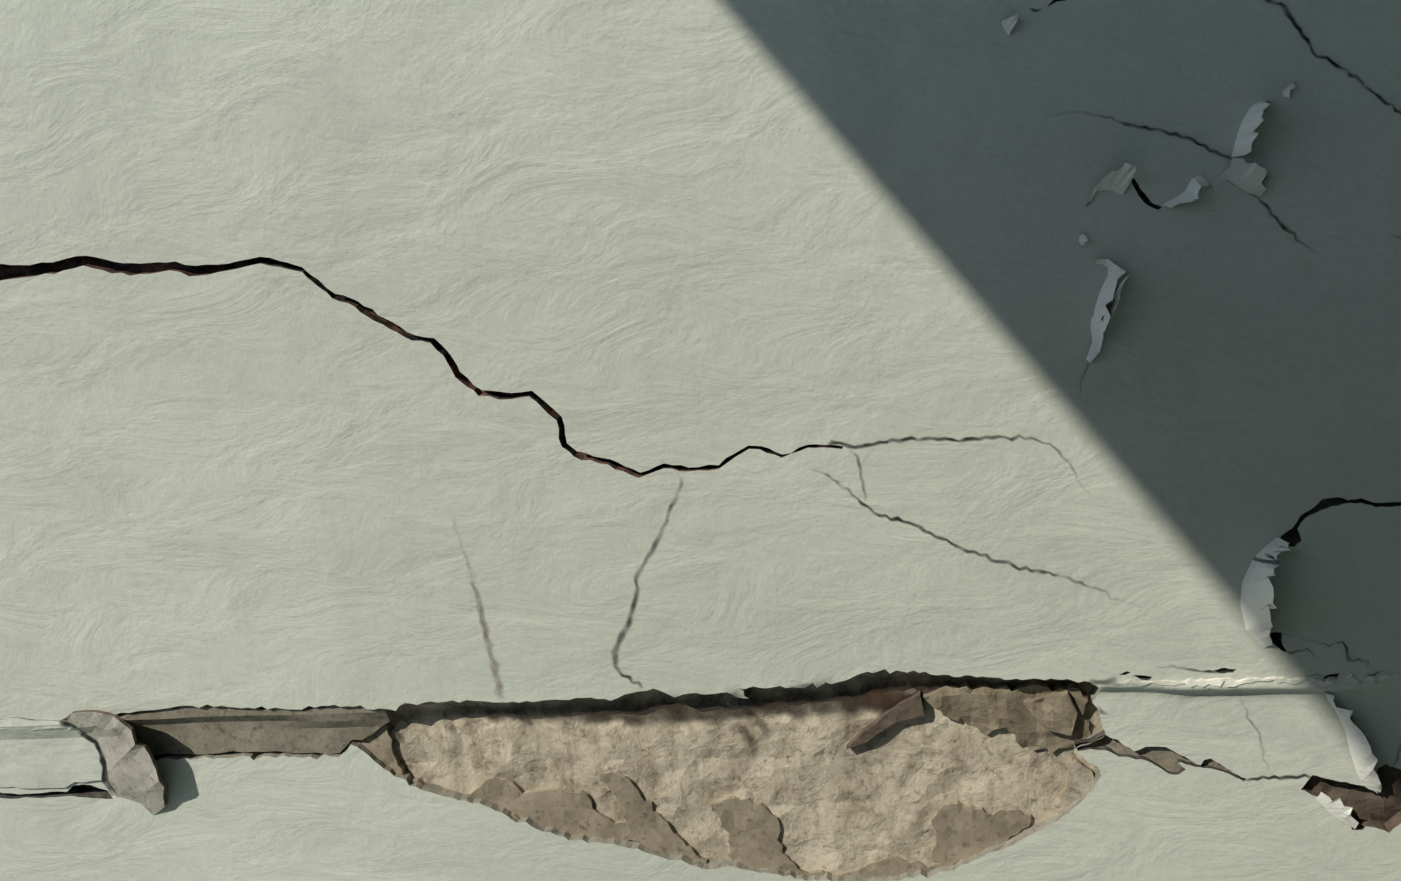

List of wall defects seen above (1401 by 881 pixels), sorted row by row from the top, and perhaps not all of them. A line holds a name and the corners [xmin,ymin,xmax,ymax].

peeling [1001,0,1066,35]
crack [1266,0,1401,114]
peeling [1088,79,1296,232]
peeling [1086,259,1128,363]
crack [0,256,1033,478]
crack [858,500,1054,576]
crack [1240,497,1401,654]
crack [613,579,637,680]
crack [0,717,113,799]
spalling [60,668,1401,881]
crack [1074,730,1308,782]